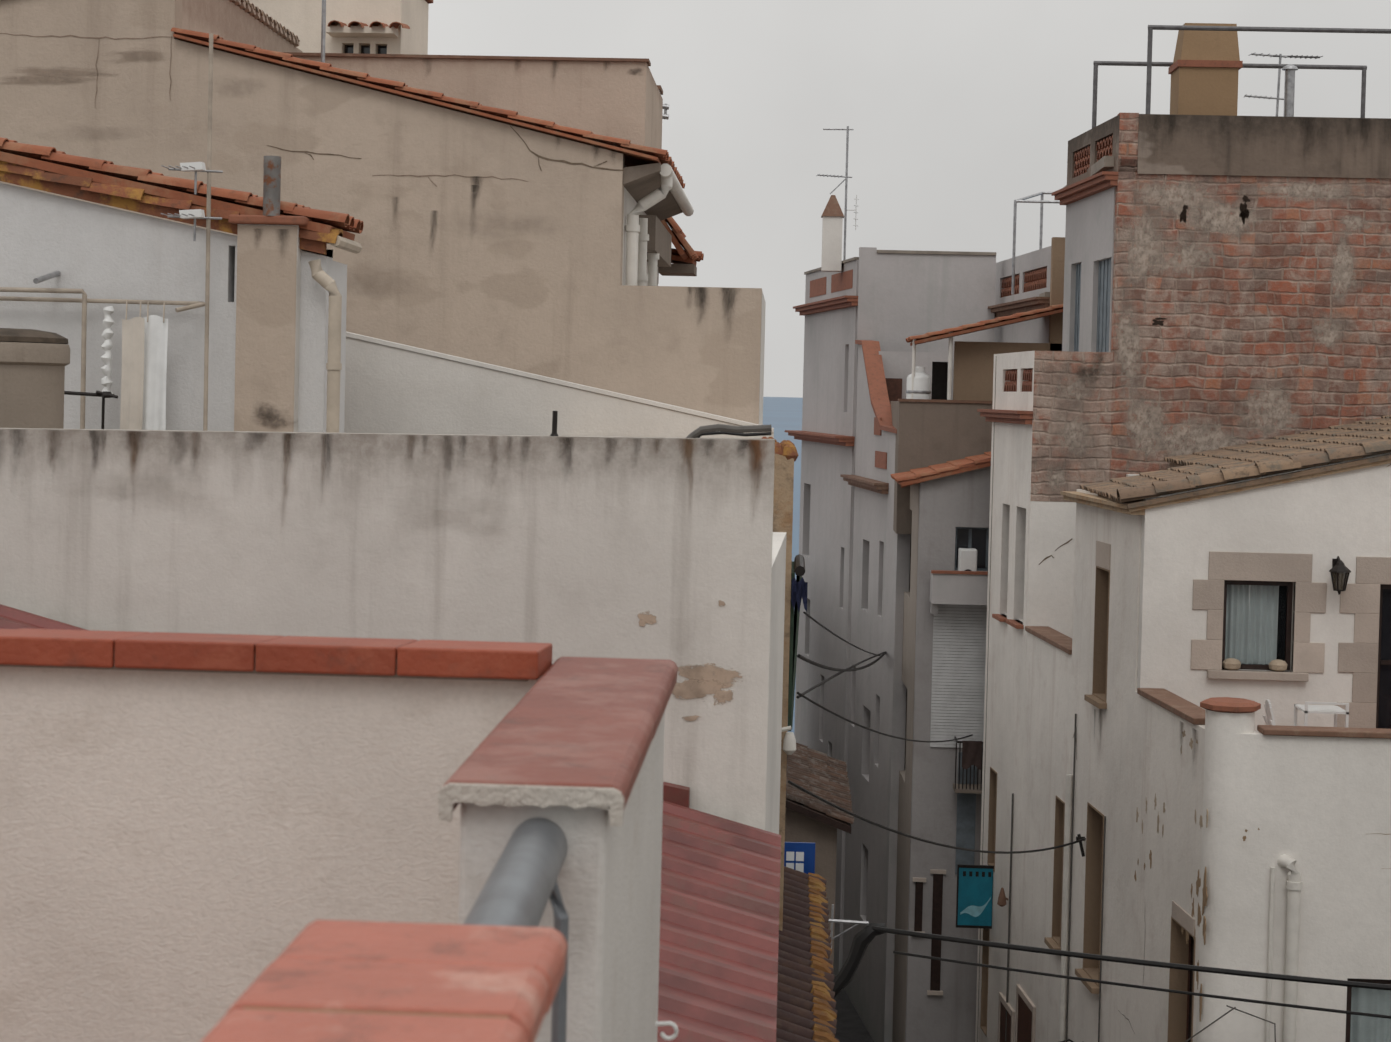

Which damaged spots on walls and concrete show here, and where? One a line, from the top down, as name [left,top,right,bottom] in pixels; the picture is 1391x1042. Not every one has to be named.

crack [0,33,172,100]
crack [267,126,624,187]
peeling [638,612,657,626]
peeling [672,663,742,721]
peeling [1181,867,1208,1022]